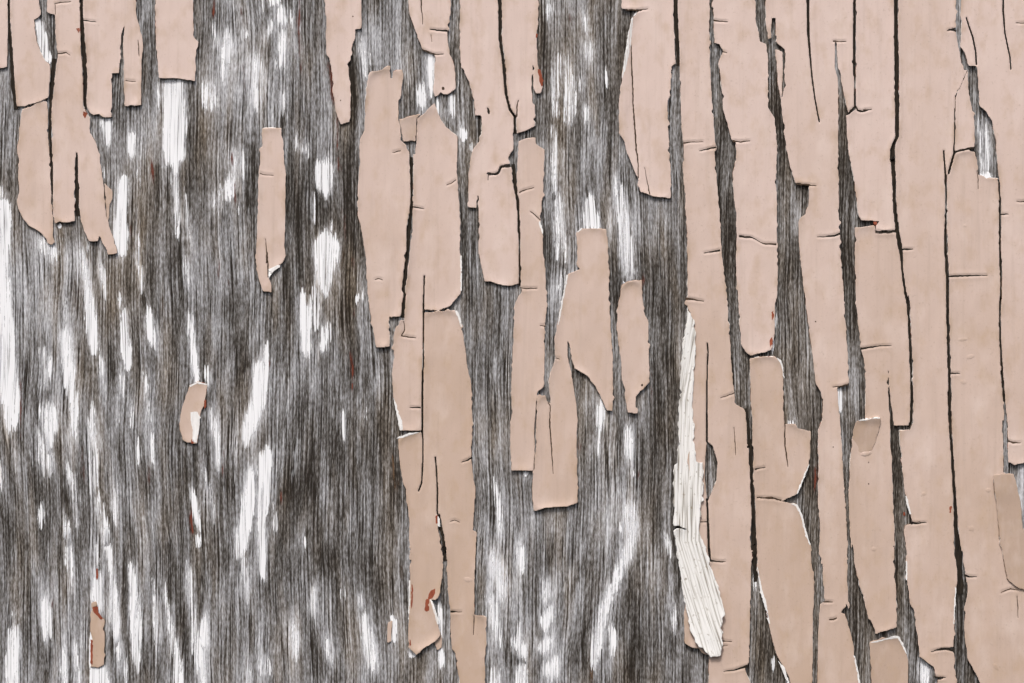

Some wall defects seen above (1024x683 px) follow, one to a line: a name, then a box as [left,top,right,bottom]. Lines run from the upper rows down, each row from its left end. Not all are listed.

peeling [0,0,143,255]
peeling [155,0,199,81]
peeling [255,127,286,293]
peeling [324,0,362,124]
crack [375,150,459,561]
crack [487,0,519,134]
peeling [357,0,650,683]
crack [488,164,540,289]
crack [706,343,788,582]
peeling [619,0,1024,683]
crack [806,0,913,427]
crack [943,96,1024,595]